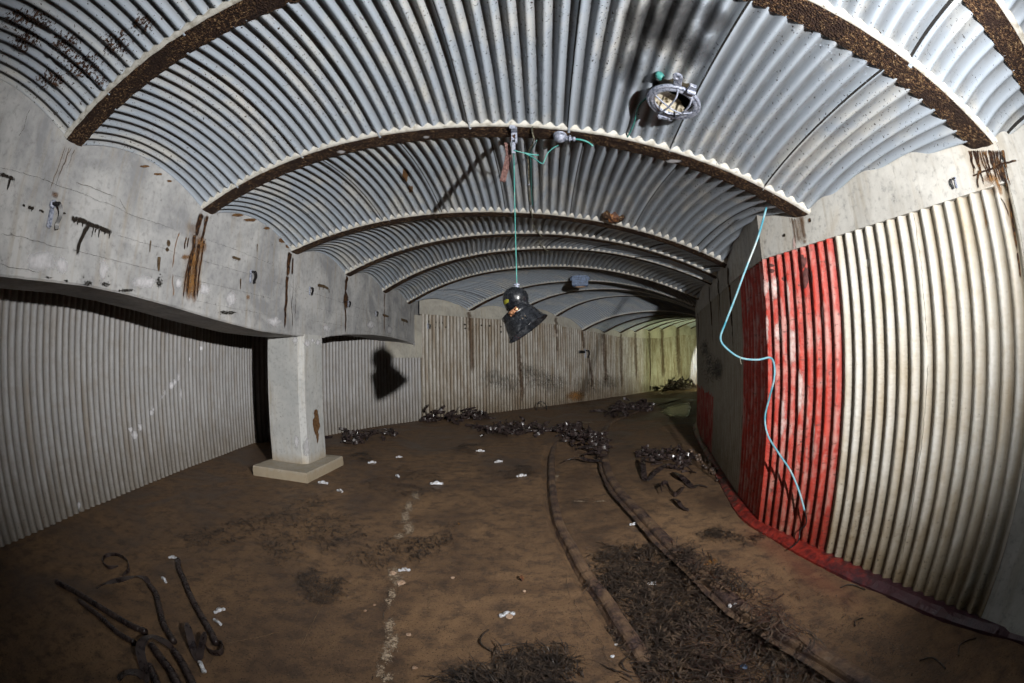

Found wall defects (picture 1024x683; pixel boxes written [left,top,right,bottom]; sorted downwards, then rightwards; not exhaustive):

rust [1,8,155,90]
rust [499,142,512,182]
leakage [63,212,112,254]
rust [166,213,209,297]
rust [279,238,296,327]
rust [969,150,1021,277]